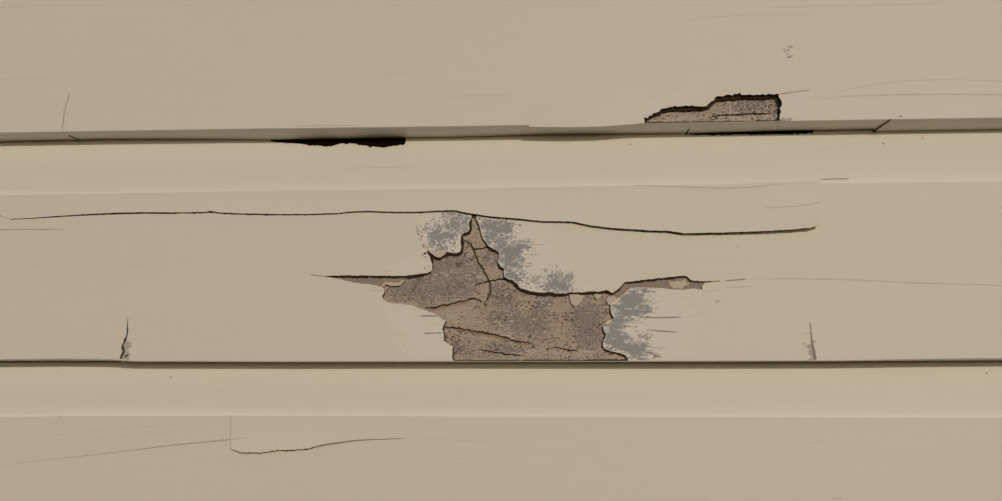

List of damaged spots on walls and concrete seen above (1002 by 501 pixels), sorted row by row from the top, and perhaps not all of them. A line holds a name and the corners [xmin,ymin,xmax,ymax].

peeling [569,294,618,307]
crack [120,320,128,359]